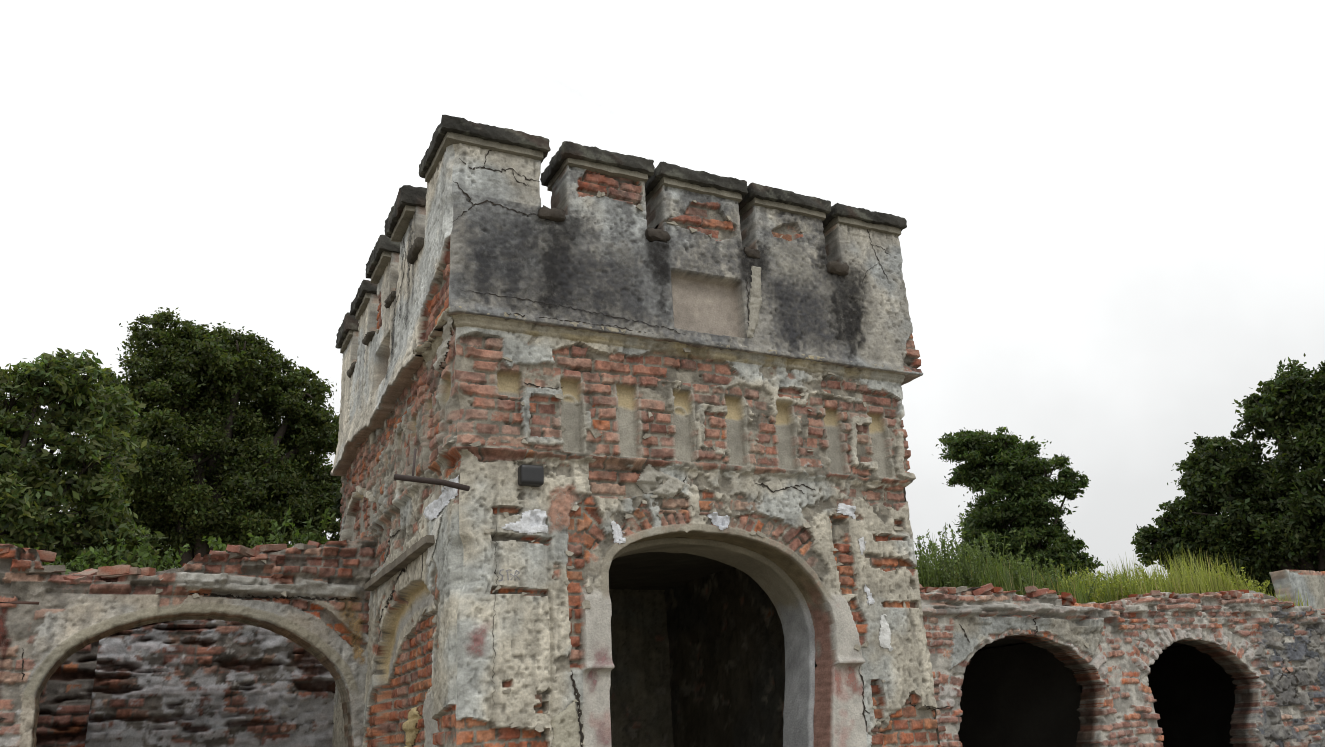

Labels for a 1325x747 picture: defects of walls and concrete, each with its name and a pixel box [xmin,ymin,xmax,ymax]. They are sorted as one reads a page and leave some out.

crack [451,150,540,224]
spalling [575,169,644,212]
damp [540,218,642,318]
damp [647,241,670,313]
damp [740,245,867,353]
crack [862,229,889,284]
spalling [413,234,566,566]
spalling [484,372,920,670]
spalling [155,570,368,650]
spalling [363,608,552,747]
crack [570,671,584,747]
spalling [1073,617,1164,747]